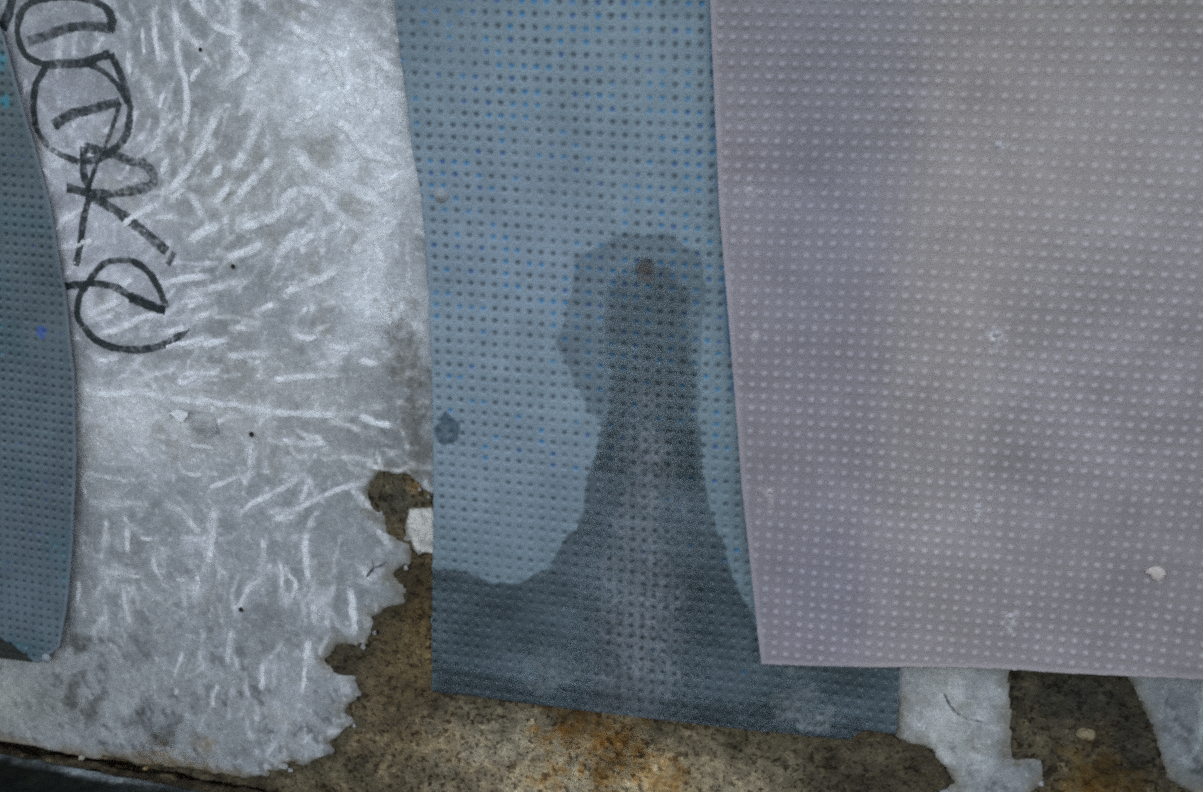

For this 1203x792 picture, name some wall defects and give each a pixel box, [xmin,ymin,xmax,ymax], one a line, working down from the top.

leakage [435,412,459,445]
spalling [102,471,955,792]
spalling [1002,670,1190,792]